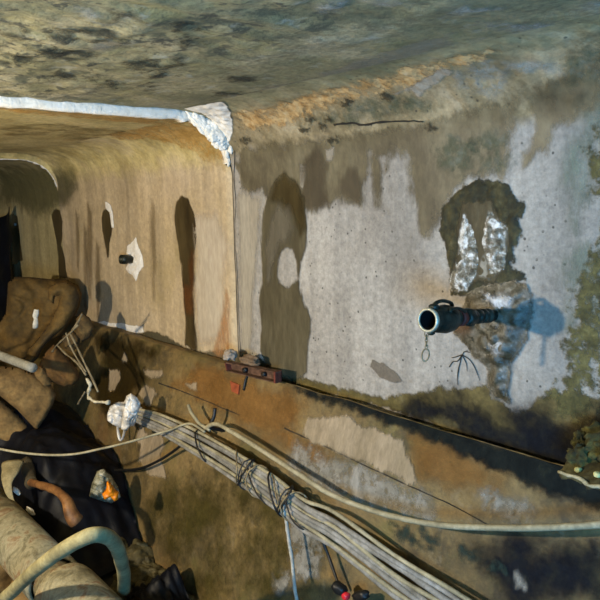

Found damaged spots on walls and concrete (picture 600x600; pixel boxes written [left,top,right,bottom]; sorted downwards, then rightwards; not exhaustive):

leakage [93,61,600,510]
crack [333,119,423,127]